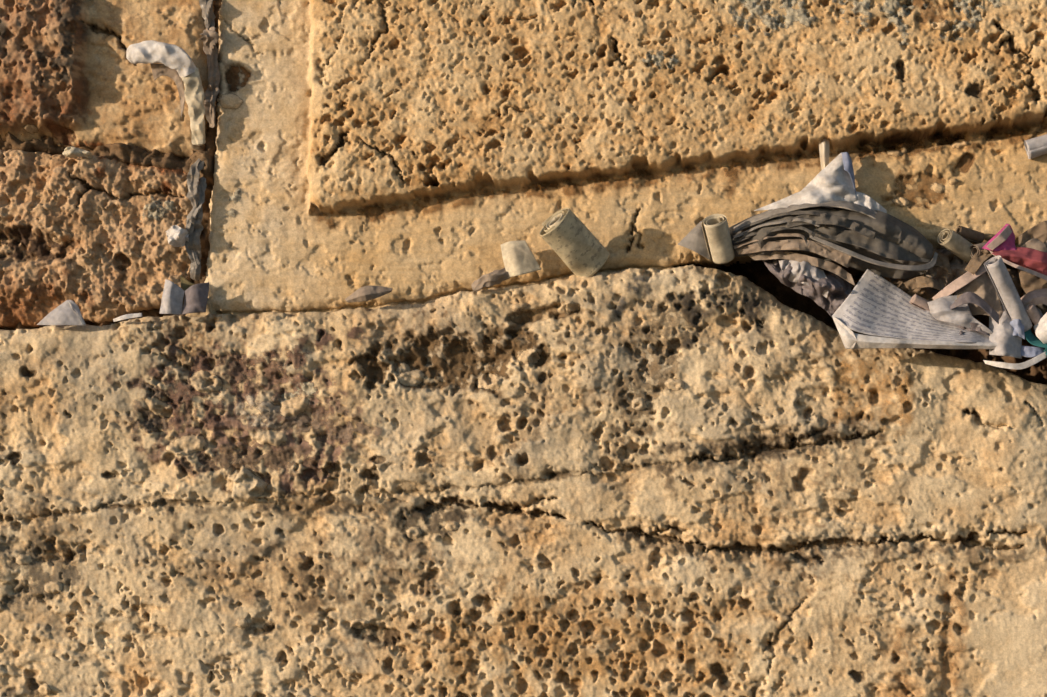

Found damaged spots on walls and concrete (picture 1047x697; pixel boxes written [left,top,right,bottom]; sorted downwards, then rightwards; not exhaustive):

crack [320,132,349,166]
crack [376,147,403,181]
crack [693,430,880,460]
crack [427,496,1027,562]